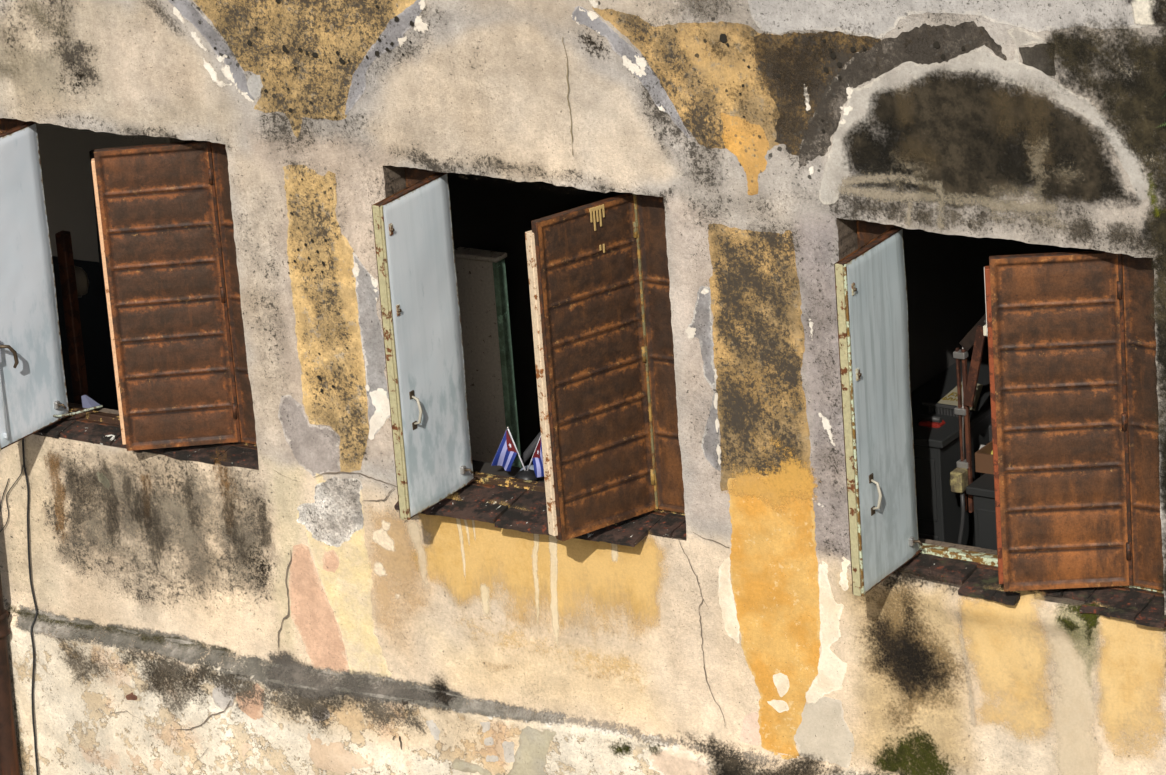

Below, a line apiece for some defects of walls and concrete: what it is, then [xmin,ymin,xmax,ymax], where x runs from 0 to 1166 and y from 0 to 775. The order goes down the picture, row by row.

peeling [173,0,429,138]
peeling [571,0,881,195]
water stain [844,0,1166,514]
water stain [55,461,280,594]
peeling [212,683,266,720]
peeling [278,164,392,678]
water stain [6,602,865,775]
peeling [452,714,568,775]
water stain [372,513,663,645]
flaking render [585,725,710,775]
crack [678,532,729,722]
peeling [685,223,850,760]